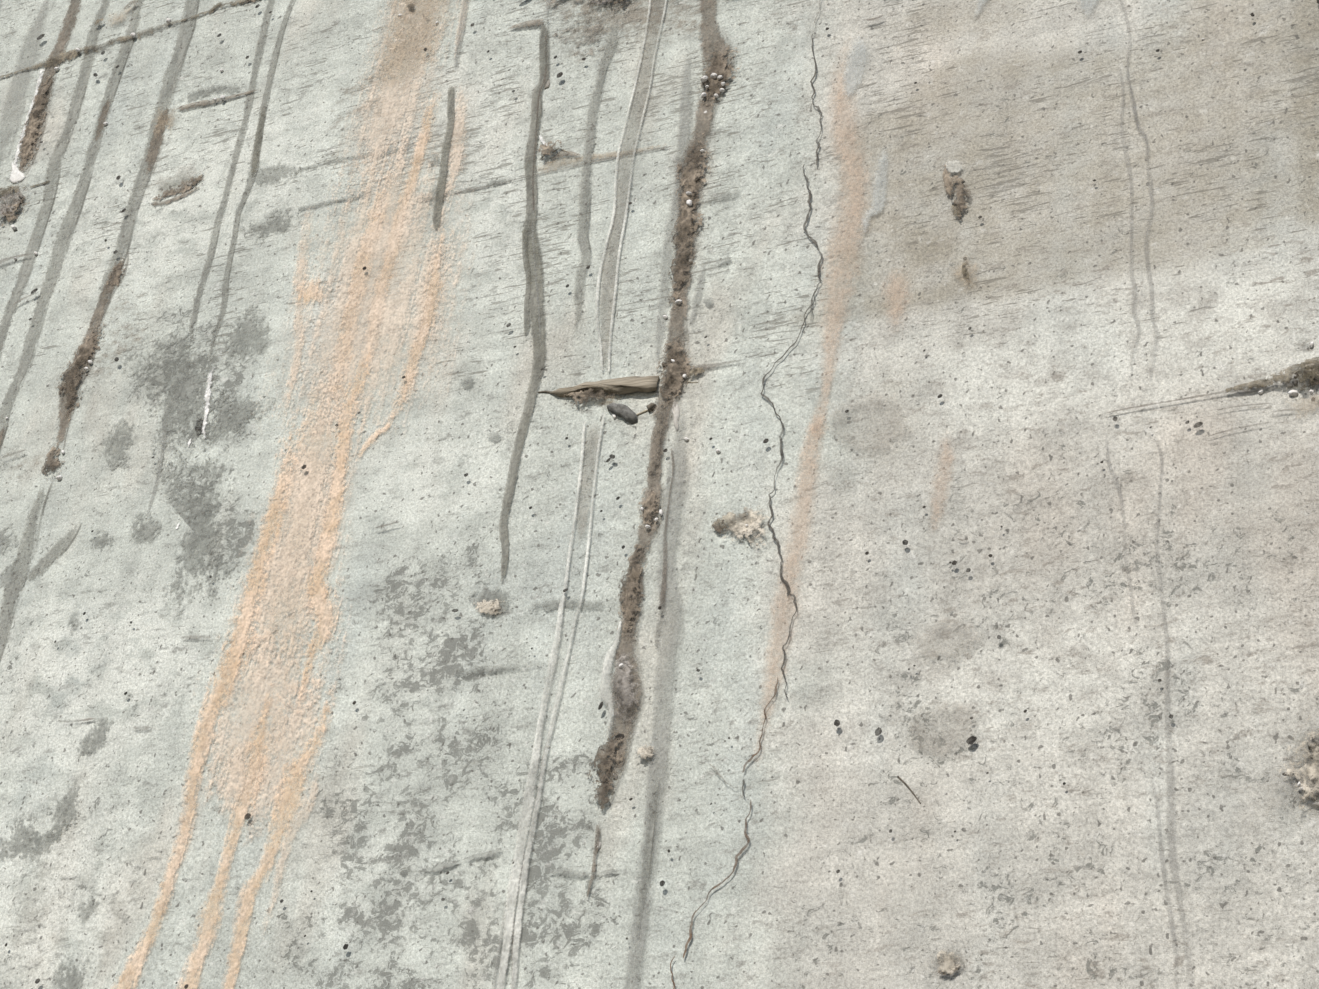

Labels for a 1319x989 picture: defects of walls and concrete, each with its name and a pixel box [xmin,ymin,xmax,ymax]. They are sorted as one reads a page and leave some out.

water stain [627,0,667,123]
rust [156,0,465,914]
crack [670,19,823,989]
water stain [494,415,605,989]
rust [118,938,150,989]
rust [179,911,218,989]
rust [225,845,285,989]